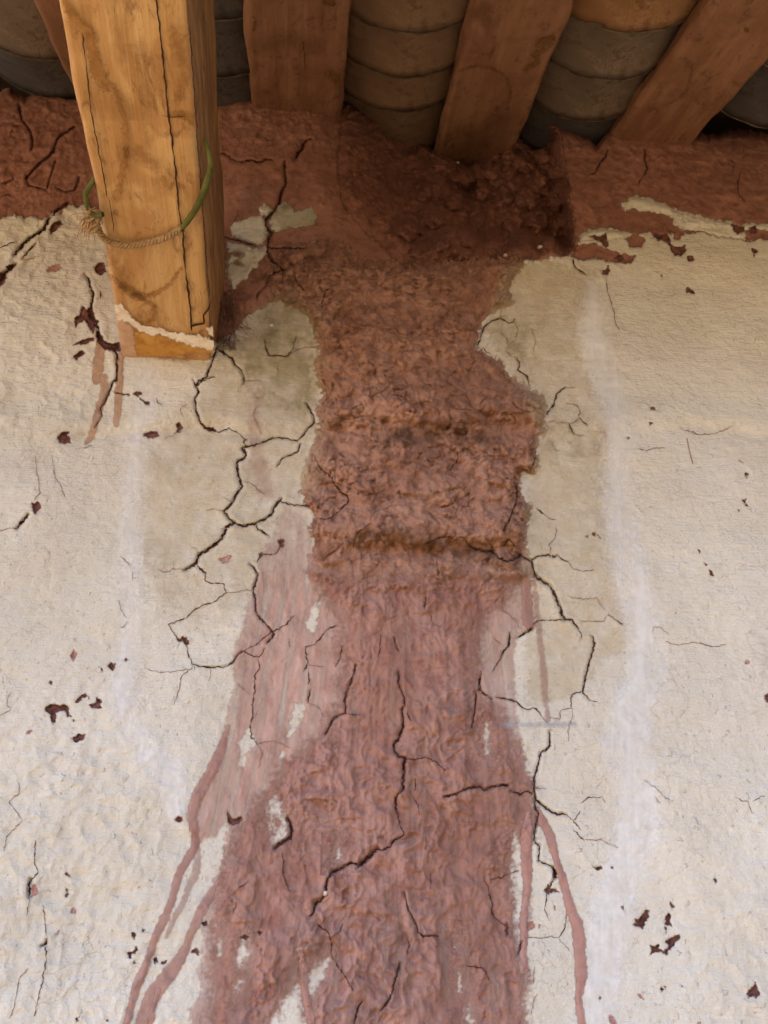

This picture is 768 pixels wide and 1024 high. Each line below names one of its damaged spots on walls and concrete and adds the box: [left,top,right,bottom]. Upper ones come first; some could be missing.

crack [155,0,334,331]
spalling [654,233,695,261]
crack [573,259,620,331]
spalling [73,305,121,360]
crack [476,303,536,384]
water stain [85,341,124,444]
spalling [57,431,71,444]
crack [73,275,445,1024]
spalling [45,694,102,723]
crack [425,387,623,1014]
spalling [634,910,649,929]
spalling [650,902,680,955]